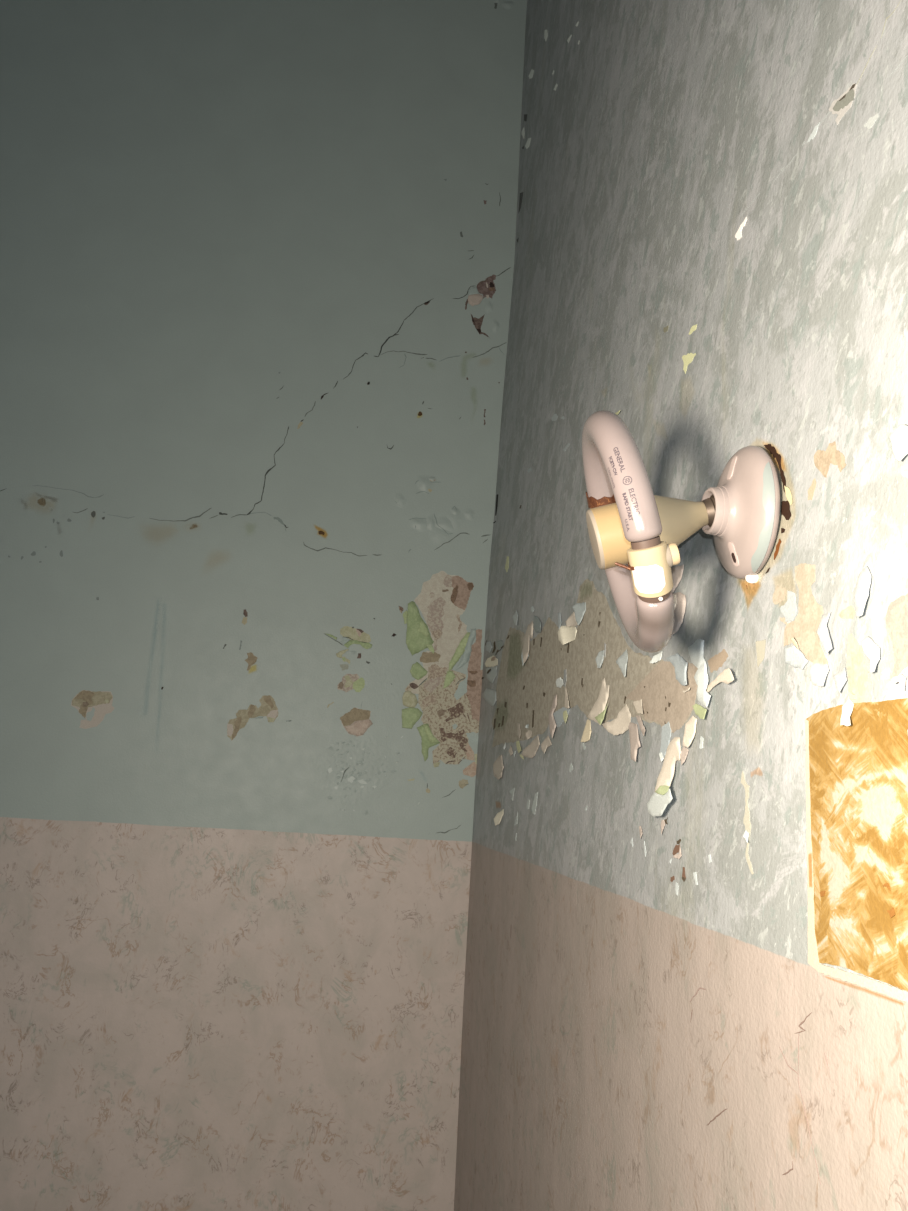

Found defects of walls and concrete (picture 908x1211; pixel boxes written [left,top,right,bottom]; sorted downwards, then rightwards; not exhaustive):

spalling [465,274,501,337]
crack [1,286,507,556]
flaking render [808,441,846,500]
flaking render [773,563,908,726]
peeling [71,690,114,729]
peeling [227,695,291,741]
peeling [325,626,373,737]
peeling [392,565,734,840]
peeling [669,839,698,895]